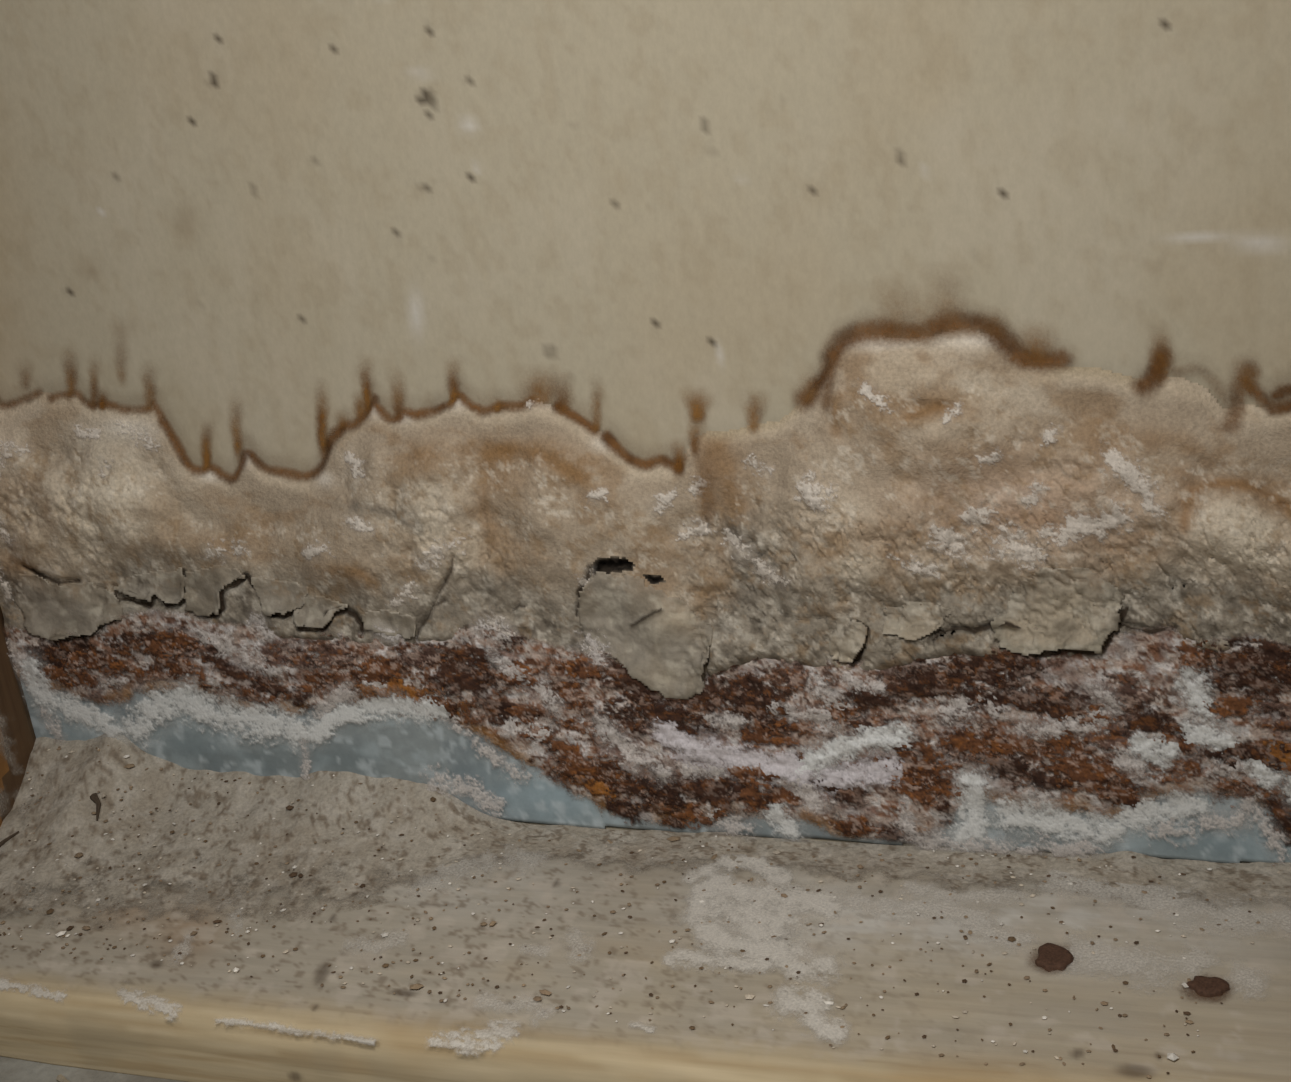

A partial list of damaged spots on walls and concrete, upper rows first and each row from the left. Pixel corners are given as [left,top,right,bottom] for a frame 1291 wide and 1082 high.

water stain [796,312,1070,405]
water stain [1136,350,1171,393]
water stain [1226,365,1291,428]
water stain [0,369,707,515]
efflorescence [887,448,1165,579]
crack [23,565,80,584]
crack [59,571,253,641]
crack [272,606,364,636]
crack [631,608,662,626]
efflorescence [675,518,791,587]
crack [932,606,1176,657]
corrosion [5,609,1291,846]